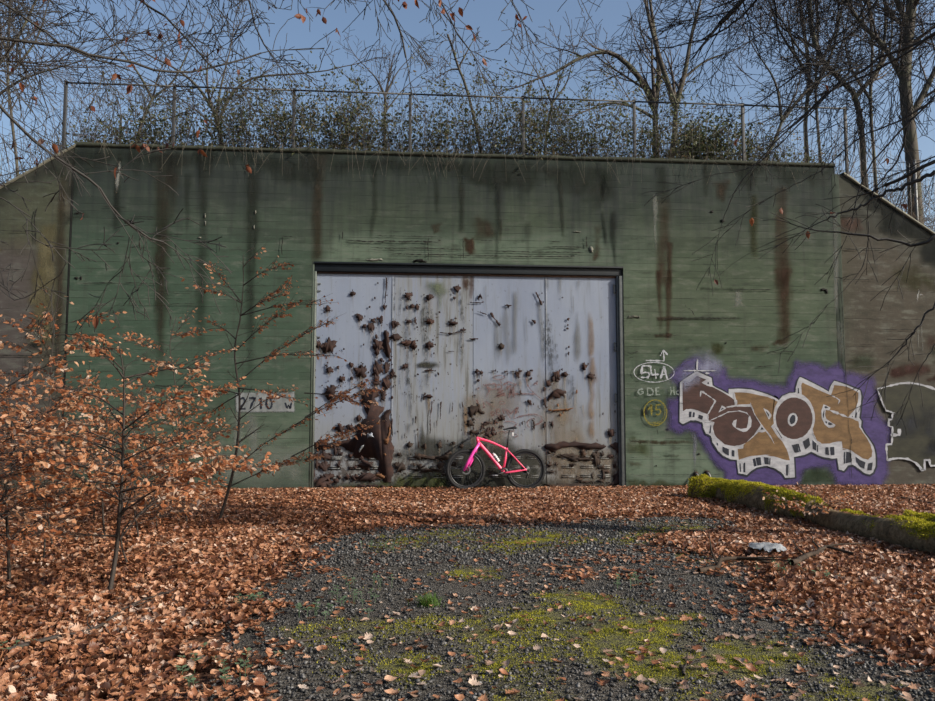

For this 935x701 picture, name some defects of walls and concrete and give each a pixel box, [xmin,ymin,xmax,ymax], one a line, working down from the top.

damp [68,149,231,346]
damp [244,155,408,332]
damp [424,162,611,238]